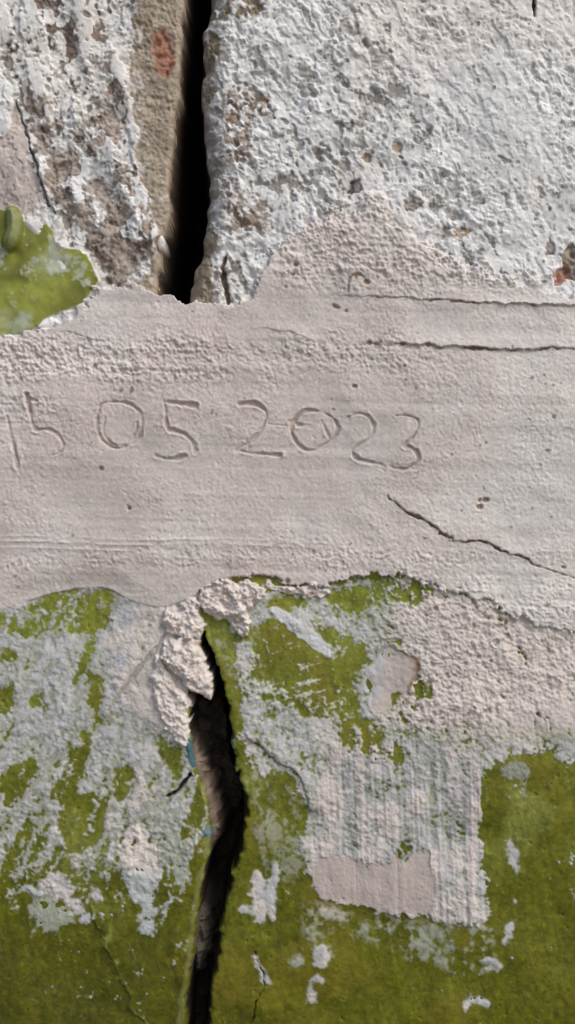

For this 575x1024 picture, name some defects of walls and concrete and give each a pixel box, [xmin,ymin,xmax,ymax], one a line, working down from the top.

spalling [0,0,189,338]
crack [158,0,232,306]
spalling [346,178,364,195]
crack [341,294,575,308]
crack [392,341,575,353]
spalling [525,229,575,287]
crack [386,494,575,580]
damp [234,605,341,716]
damp [0,715,203,921]
peeling [174,783,214,1024]
crack [165,667,311,1024]
peeling [283,573,575,993]